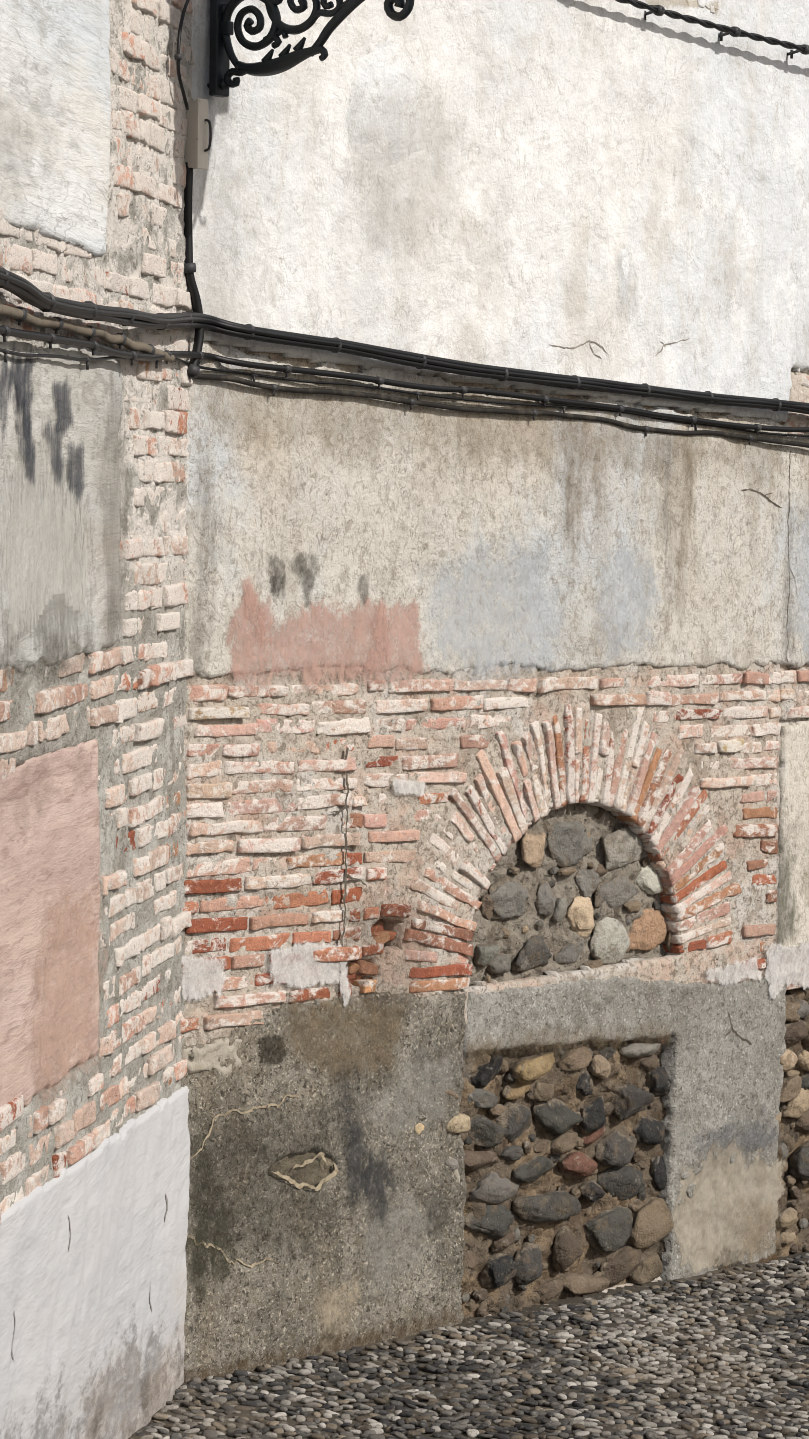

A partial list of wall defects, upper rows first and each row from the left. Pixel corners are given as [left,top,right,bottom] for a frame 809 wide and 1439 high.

peeling [686,0,719,13]
leakage [0,349,95,669]
spalling [267,1151,339,1191]
leakage [270,942,404,1217]